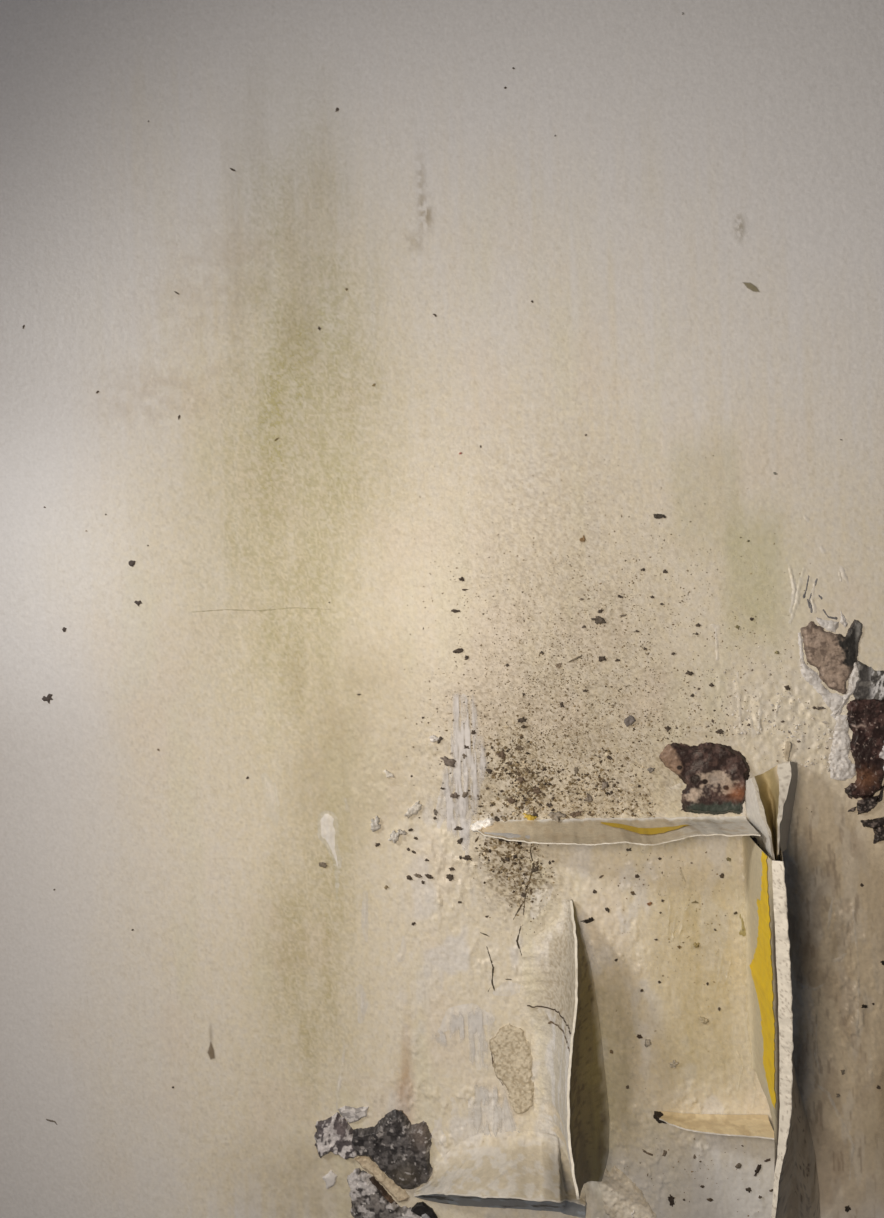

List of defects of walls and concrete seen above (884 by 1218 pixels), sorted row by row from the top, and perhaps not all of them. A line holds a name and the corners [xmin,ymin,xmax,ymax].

peeling [314,883,656,1218]
water stain [490,841,541,899]
peeling [371,693,820,1218]